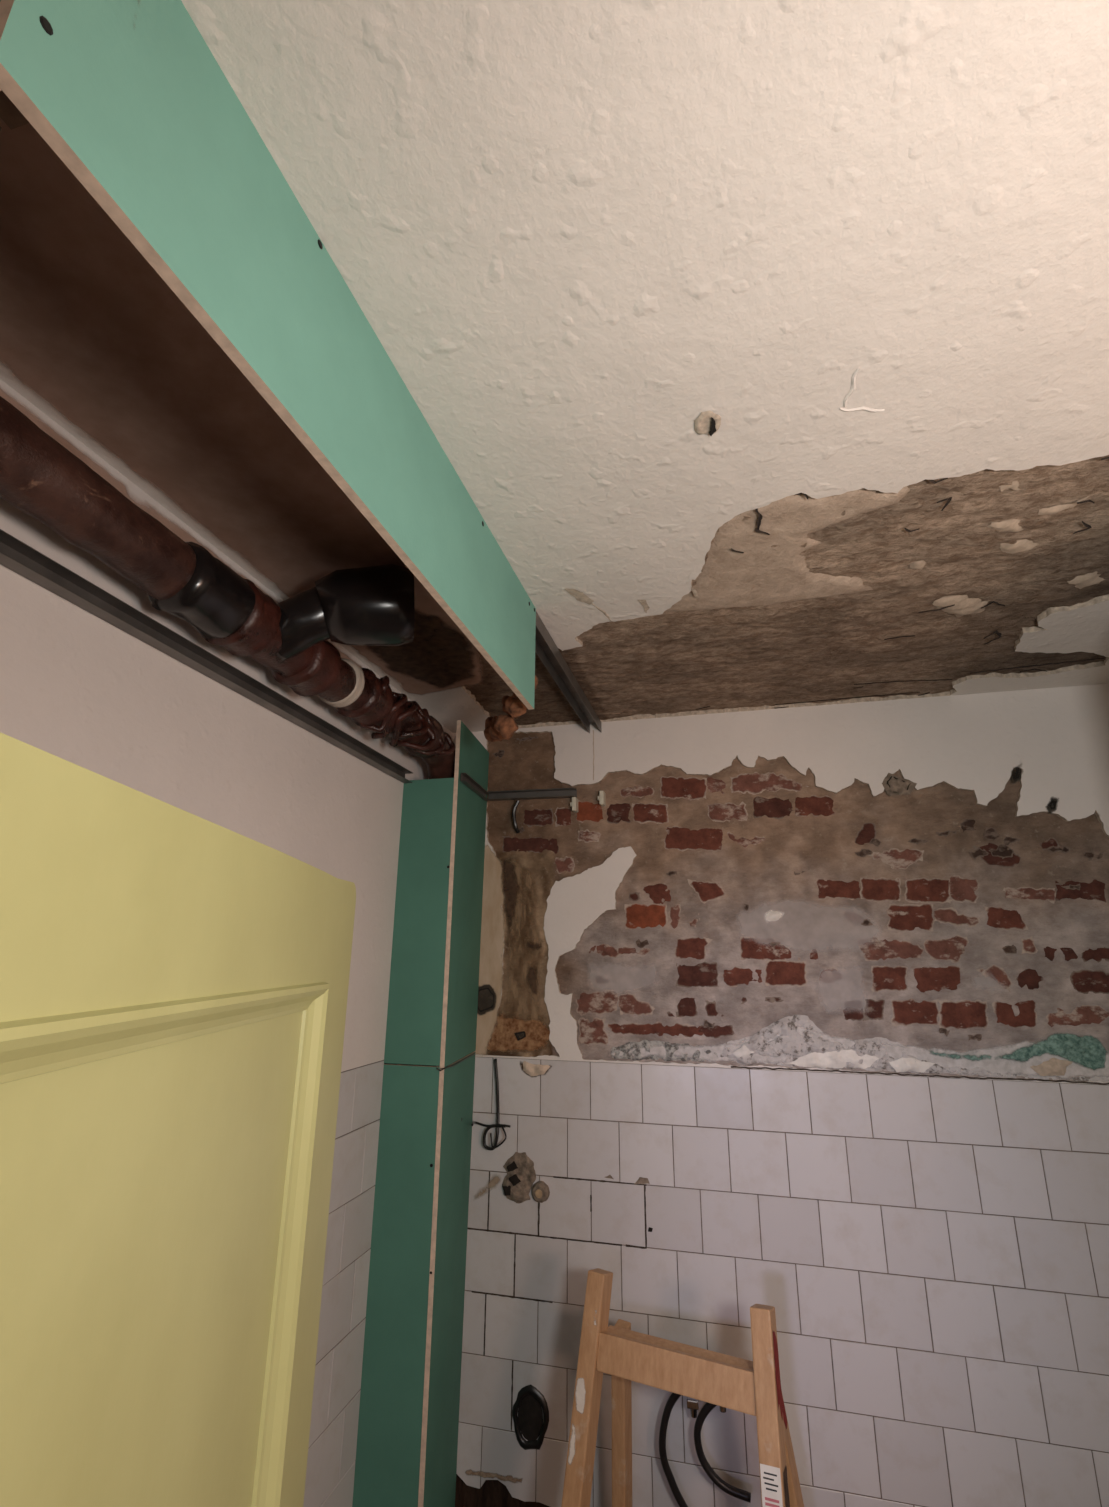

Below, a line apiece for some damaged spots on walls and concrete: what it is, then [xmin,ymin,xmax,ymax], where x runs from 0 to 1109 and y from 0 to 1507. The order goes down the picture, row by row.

spalling [694,411,721,436]
peeling [1038,496,1089,515]
peeling [987,519,1038,554]
peeling [1067,571,1105,589]
spalling [565,589,594,605]
peeling [932,595,988,617]
leakage [763,909,785,923]
flaking render [477,732,1109,1081]
leakage [610,1015,1109,1082]
spalling [502,1152,536,1204]